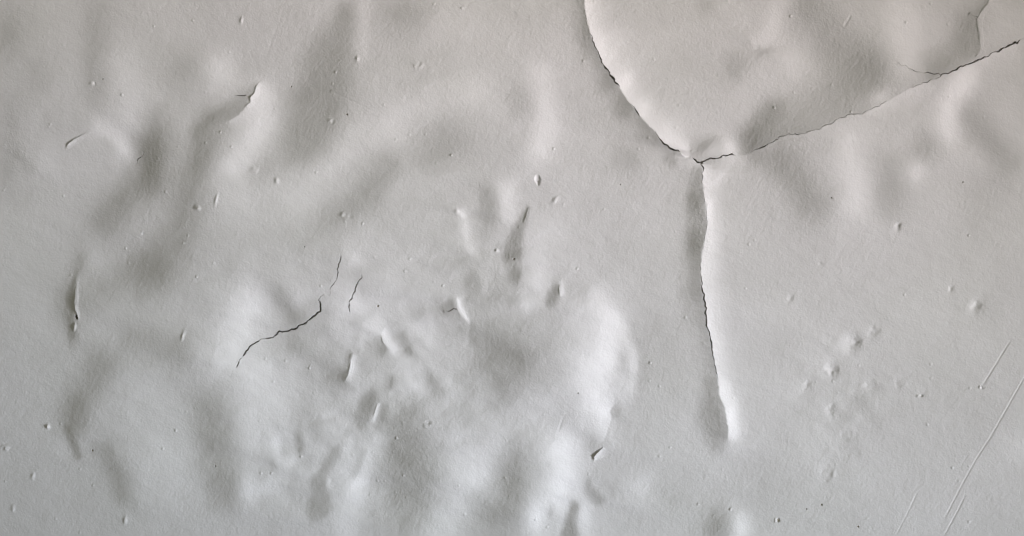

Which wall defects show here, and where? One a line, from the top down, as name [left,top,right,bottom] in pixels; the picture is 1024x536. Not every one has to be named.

crack [233,246,365,370]
crack [580,0,1024,386]